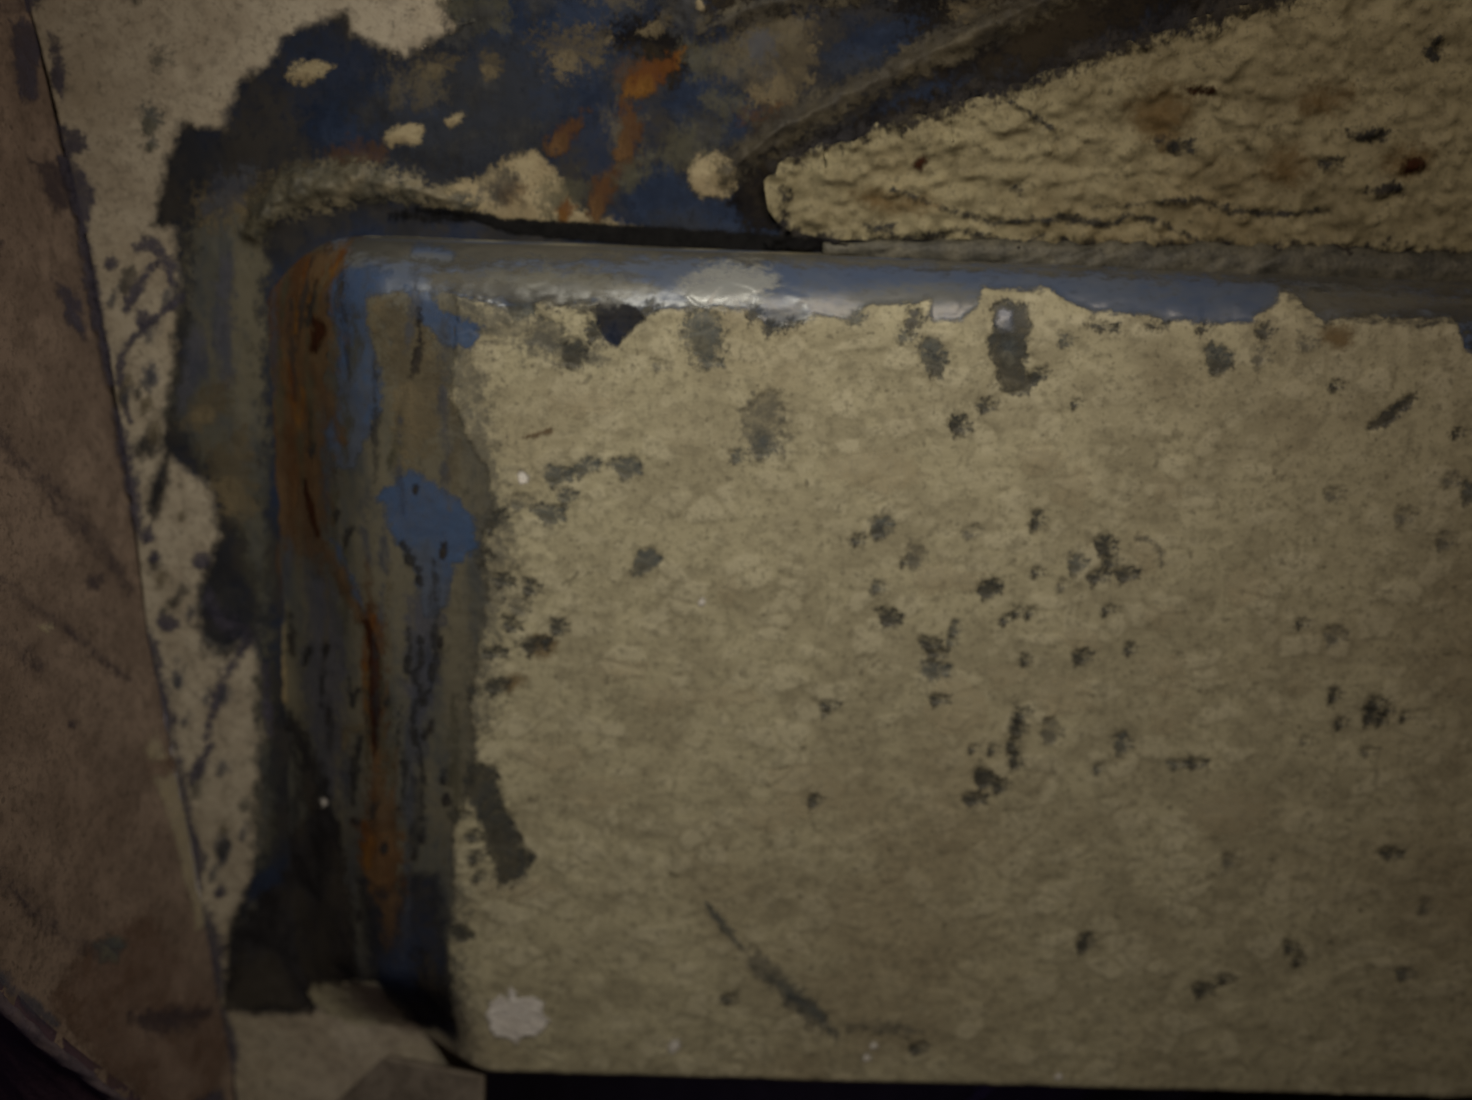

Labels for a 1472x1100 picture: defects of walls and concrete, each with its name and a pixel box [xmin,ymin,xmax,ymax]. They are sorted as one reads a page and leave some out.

rust [559,47,685,222]
spalling [1363,157,1426,199]
peeling [37,126,114,385]
peeling [525,316,602,369]
peeling [919,337,950,379]
peeling [987,298,1053,396]
peeling [949,395,999,437]
peeling [1367,395,1418,430]
peeling [534,455,643,526]
peeling [1058,534,1141,591]
peeling [519,617,567,659]
peeling [962,708,1056,807]